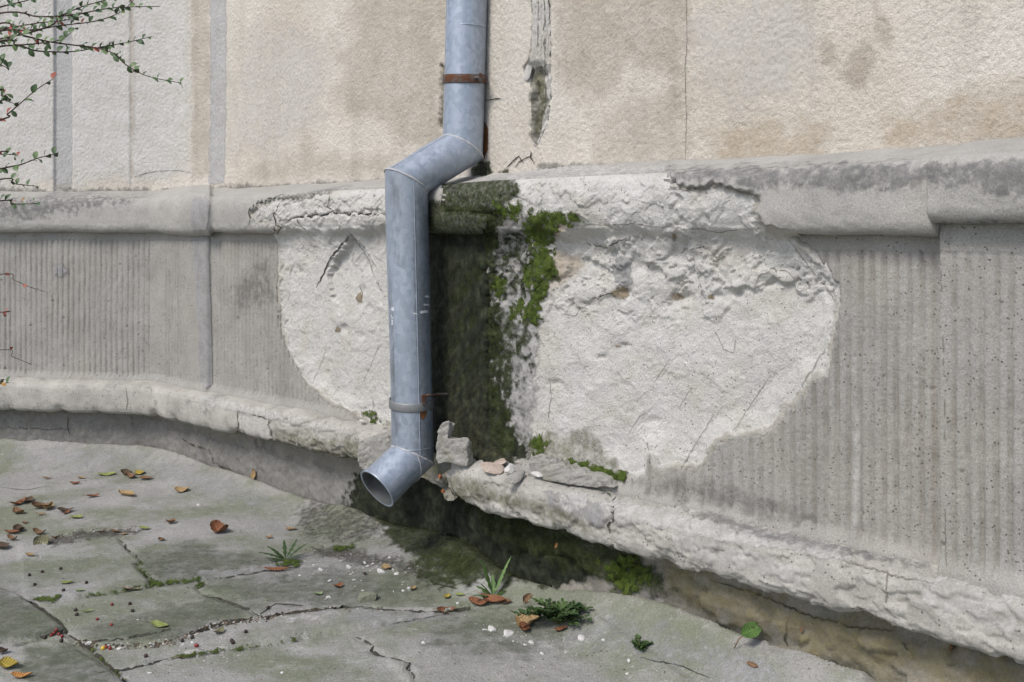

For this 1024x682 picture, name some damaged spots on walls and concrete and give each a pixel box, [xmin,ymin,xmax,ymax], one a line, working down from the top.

spalling [524,0,552,150]
crack [248,192,383,293]
spalling [250,189,391,426]
spalling [486,164,853,588]
leakage [342,473,607,593]
crack [23,567,470,682]